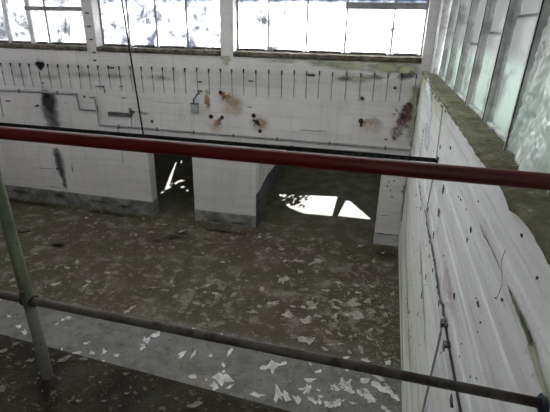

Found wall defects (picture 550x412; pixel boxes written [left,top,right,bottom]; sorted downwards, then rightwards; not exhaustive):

damp [45,104,59,131]
corrosion [384,102,413,140]
damp [54,149,67,188]